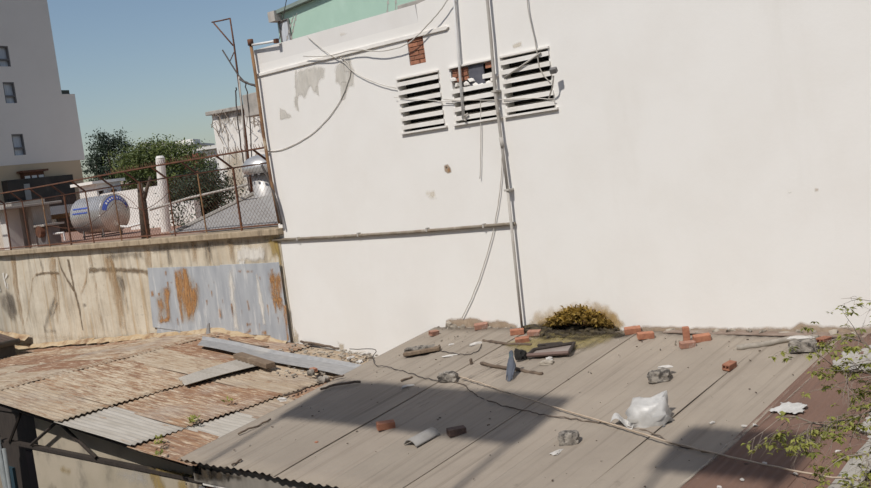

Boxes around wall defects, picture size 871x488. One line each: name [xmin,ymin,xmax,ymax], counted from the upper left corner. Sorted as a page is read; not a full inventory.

peeling [280,68,323,119]
peeling [336,58,354,100]
corrosion [151,269,212,323]
corrosion [267,271,288,340]